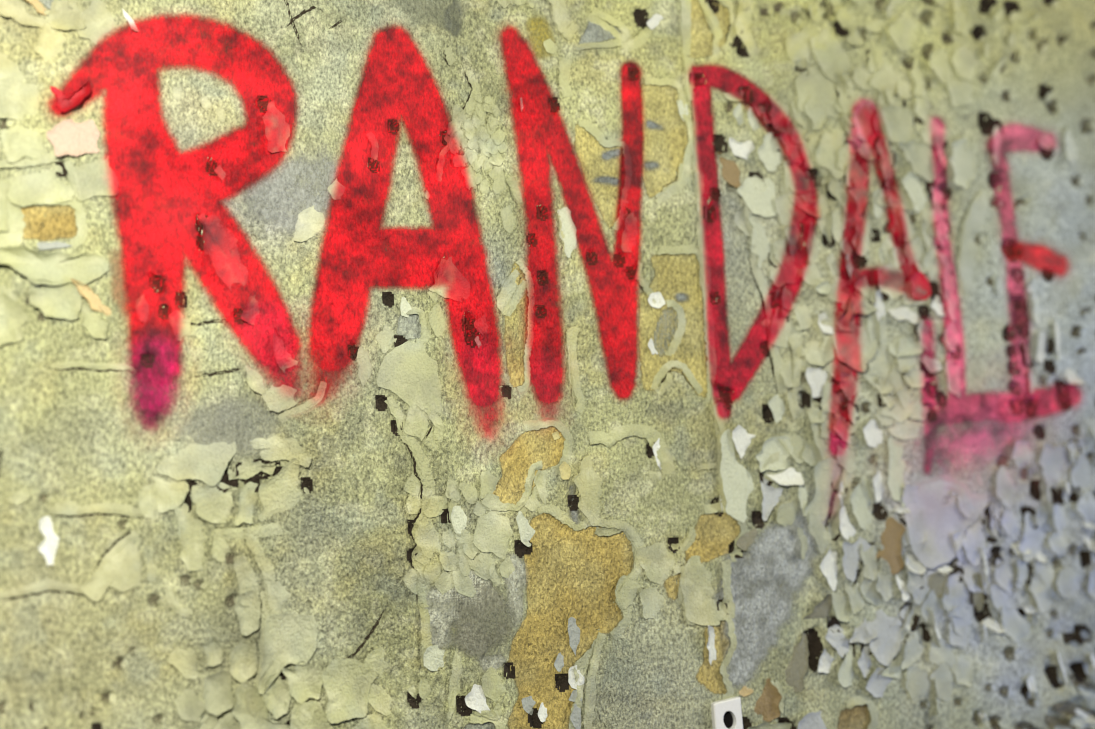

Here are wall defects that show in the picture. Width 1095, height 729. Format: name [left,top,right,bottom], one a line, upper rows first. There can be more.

peeling [0,0,139,63]
peeling [0,52,119,250]
peeling [327,178,345,200]
peeling [348,0,1095,729]
peeling [114,646,139,669]
peeling [79,692,116,729]